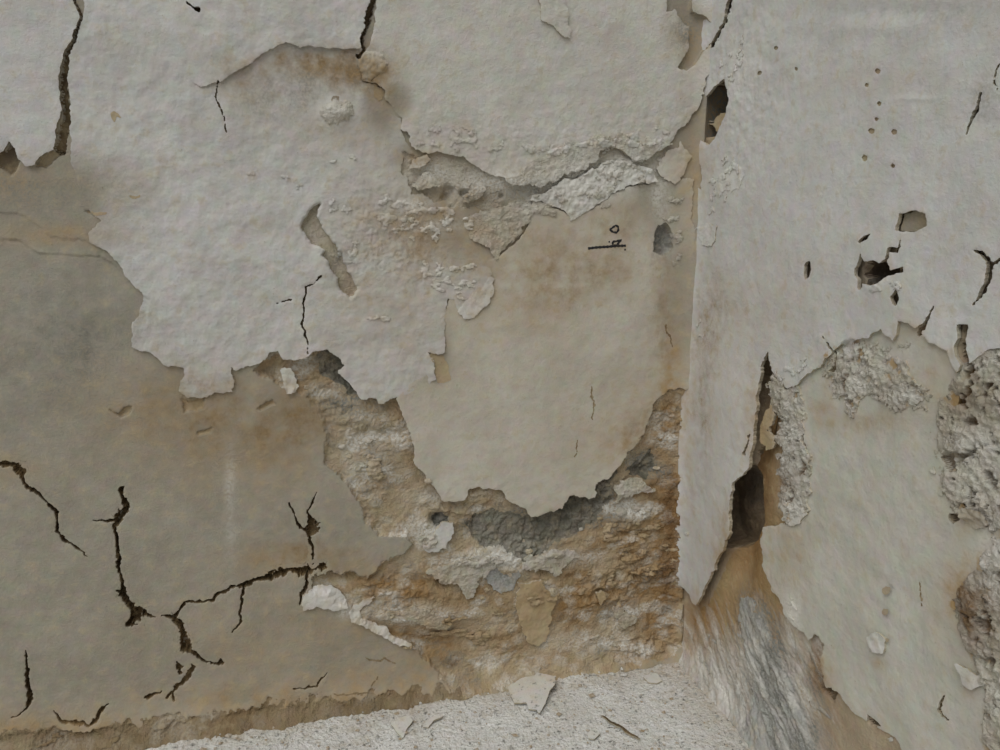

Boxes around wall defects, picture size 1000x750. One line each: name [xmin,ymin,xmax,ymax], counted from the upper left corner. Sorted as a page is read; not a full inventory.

crack [54,0,83,156]
crack [215,81,227,133]
crack [356,0,376,58]
crack [276,275,321,349]
flaking render [0,0,696,750]
flaking render [361,0,1000,750]
crack [0,457,332,707]
crack [7,647,114,733]